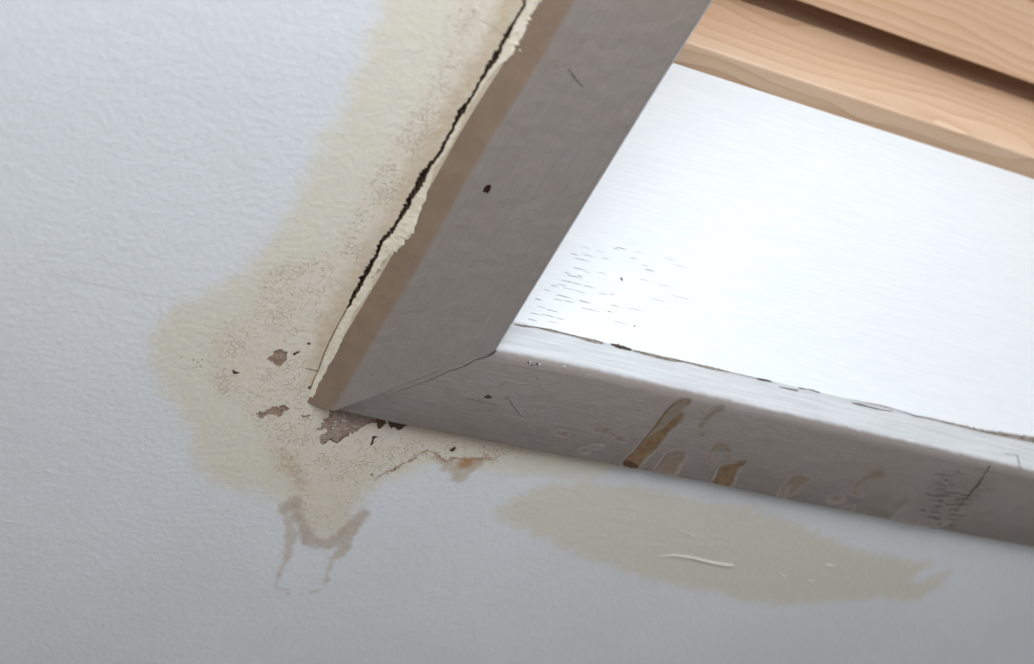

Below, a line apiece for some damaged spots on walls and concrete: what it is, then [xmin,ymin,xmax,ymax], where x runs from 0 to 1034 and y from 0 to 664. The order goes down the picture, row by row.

peeling [256,405,289,419]
peeling [267,342,311,367]
peeling [317,410,407,445]
crack [205,0,526,485]
peeling [308,0,542,398]
damp [130,0,962,613]